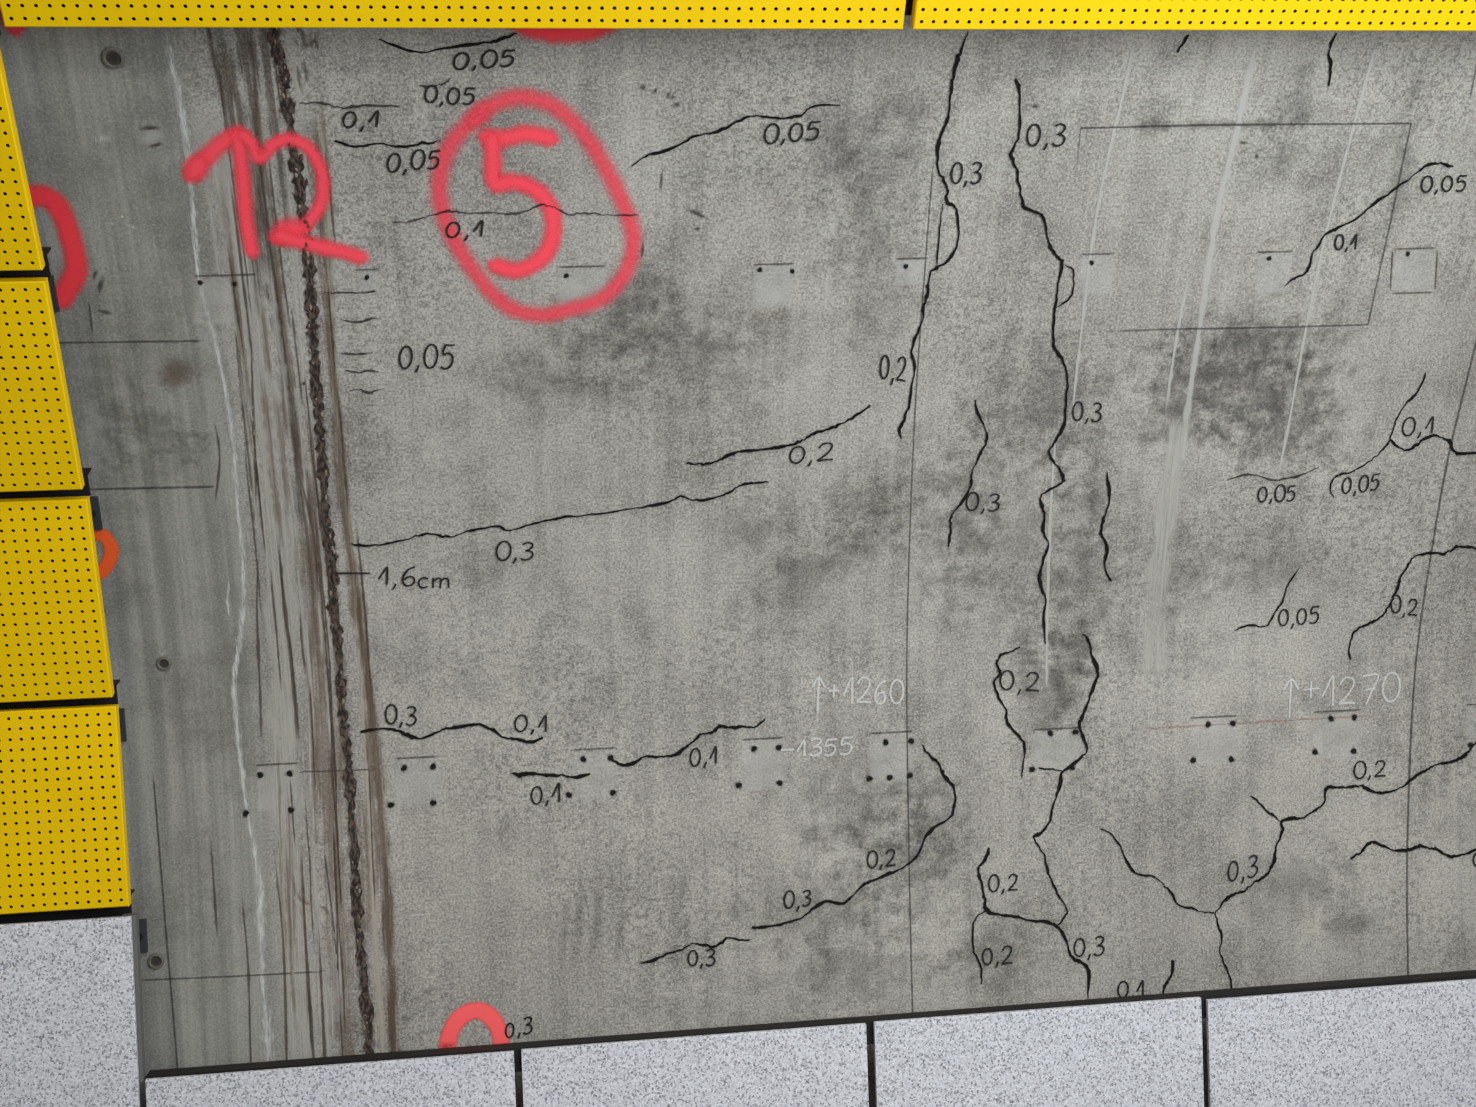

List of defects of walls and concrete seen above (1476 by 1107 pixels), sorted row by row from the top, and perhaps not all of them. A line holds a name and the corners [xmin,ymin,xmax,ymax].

crack [1284,162,1453,286]
crack [267,28,968,1054]
crack [948,400,989,547]
crack [972,79,1100,999]
crack [1099,473,1112,582]
crack [1228,373,1476,498]
crack [1348,544,1476,660]
crack [1101,742,1476,988]
crack [1162,960,1175,993]